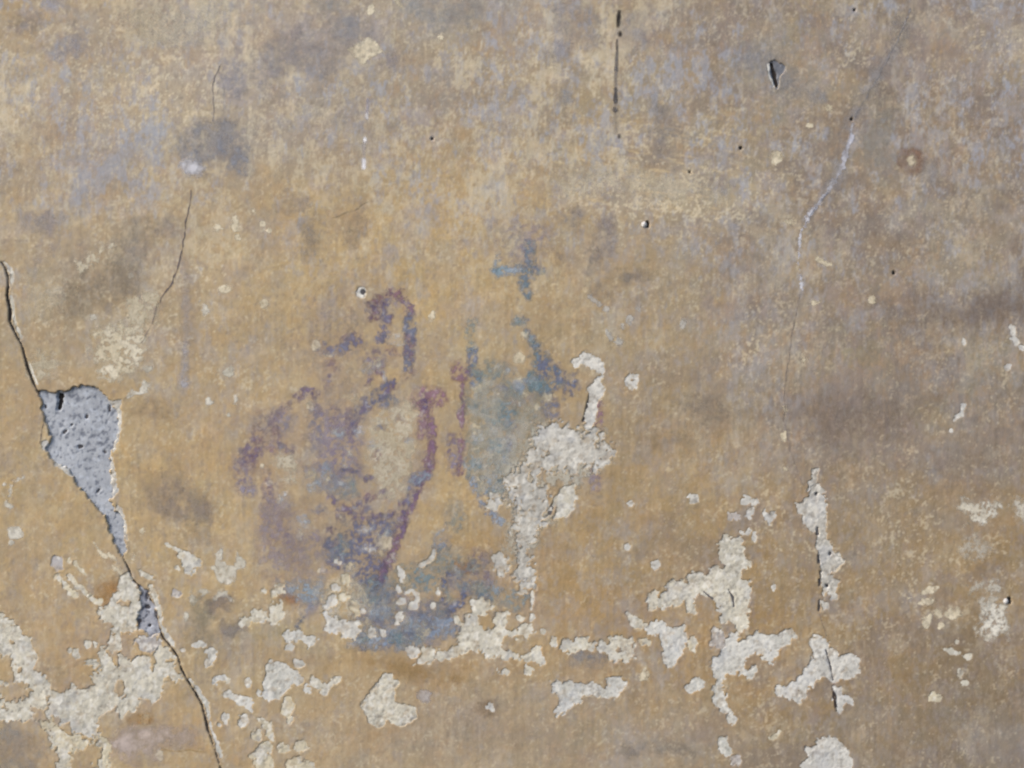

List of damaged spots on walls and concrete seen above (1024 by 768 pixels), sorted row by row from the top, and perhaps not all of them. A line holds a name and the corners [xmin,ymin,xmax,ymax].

hole [767,60,785,89]
crack [1,261,40,394]
crack [141,190,191,343]
crack [783,8,911,491]
crack [123,554,223,768]
spalling [0,366,440,768]
peeling [405,351,861,768]
crack [830,688,838,708]